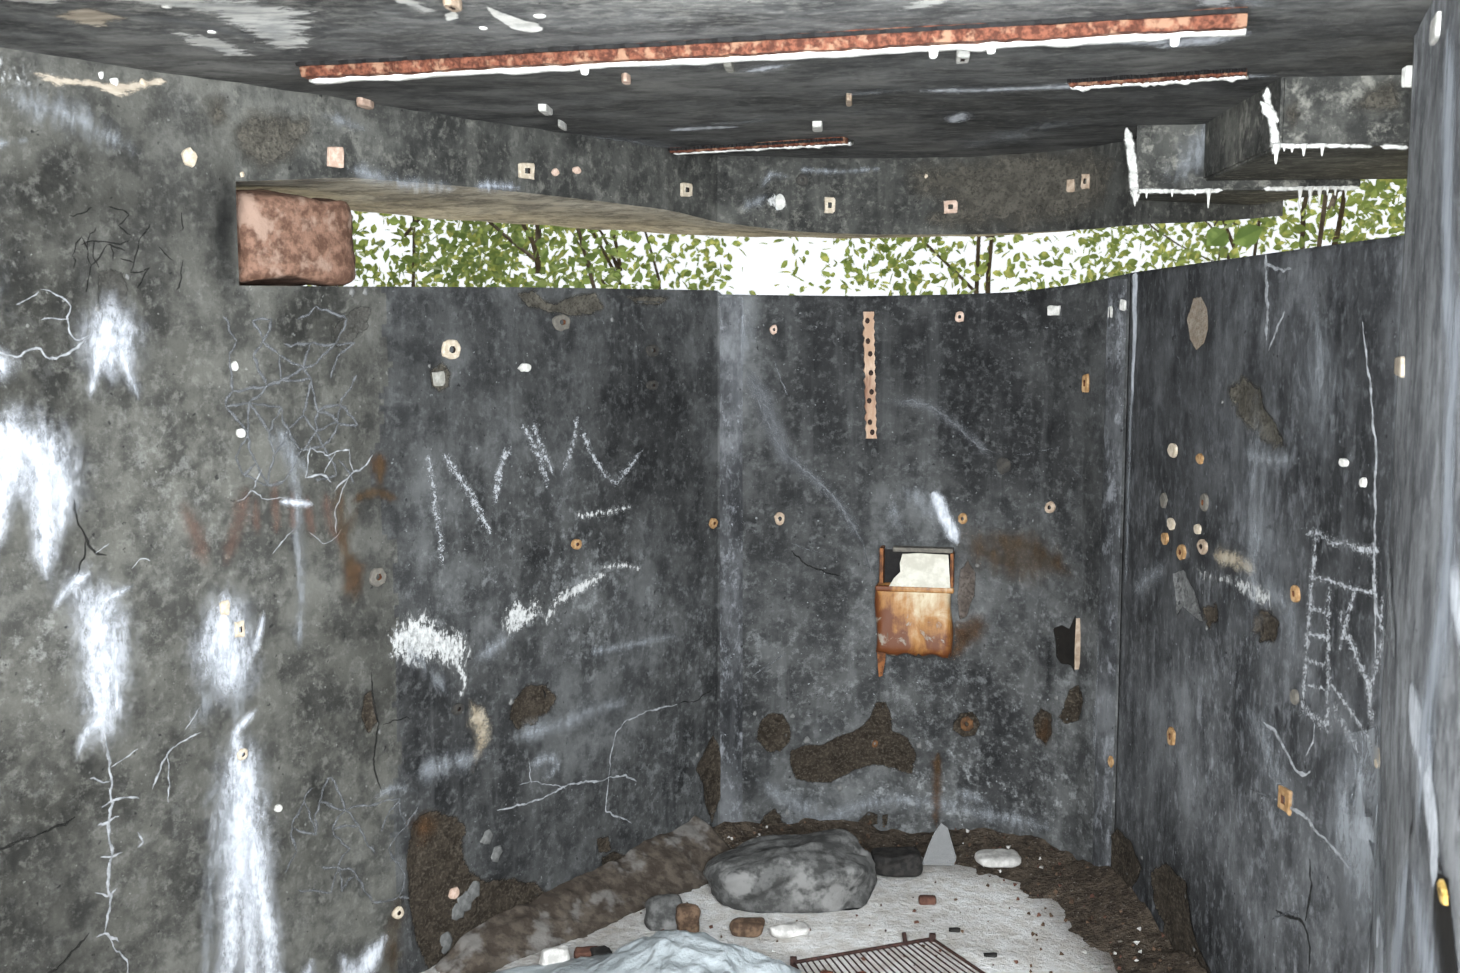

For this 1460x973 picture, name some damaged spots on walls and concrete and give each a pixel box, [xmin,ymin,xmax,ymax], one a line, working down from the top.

corrosion [862,312,877,439]